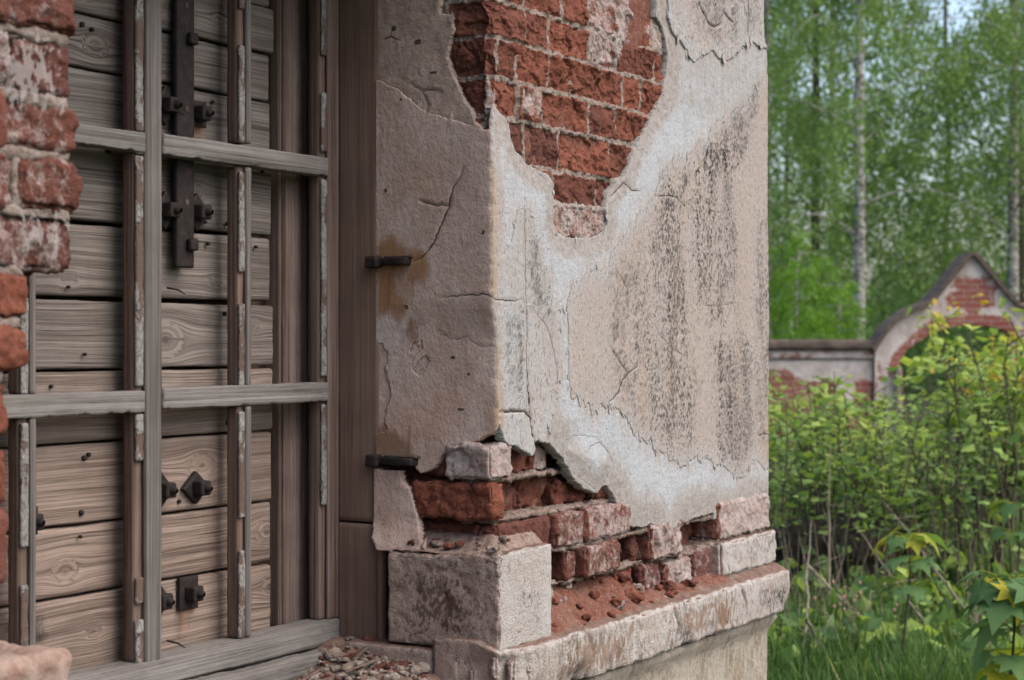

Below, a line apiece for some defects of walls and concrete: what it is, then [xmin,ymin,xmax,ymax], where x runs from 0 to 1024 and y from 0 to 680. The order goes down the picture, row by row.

corrosion [378,238,427,337]
crack [420,169,463,257]
crack [448,189,558,444]
spalling [371,0,777,637]
leakage [603,76,770,476]